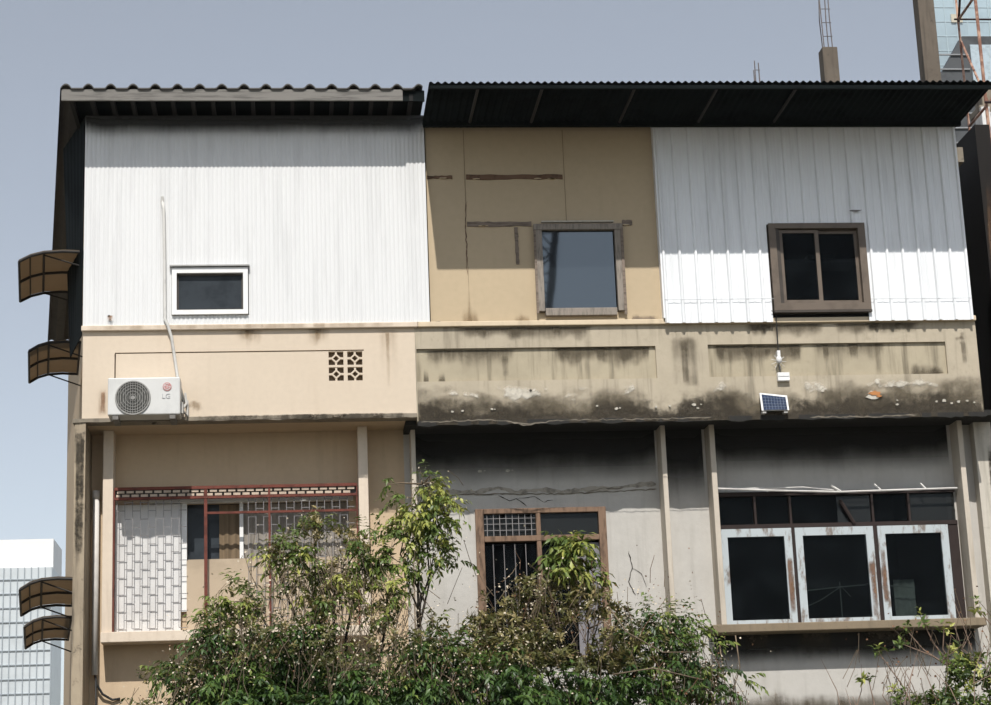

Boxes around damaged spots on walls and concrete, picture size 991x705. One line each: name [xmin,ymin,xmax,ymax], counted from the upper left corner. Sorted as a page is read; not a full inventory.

damp [464,326,587,336]
damp [750,324,819,332]
damp [837,323,914,331]
damp [429,349,511,359]
damp [557,347,648,360]
damp [716,345,800,358]
damp [819,344,880,353]
damp [415,369,984,478]
damp [75,438,84,551]